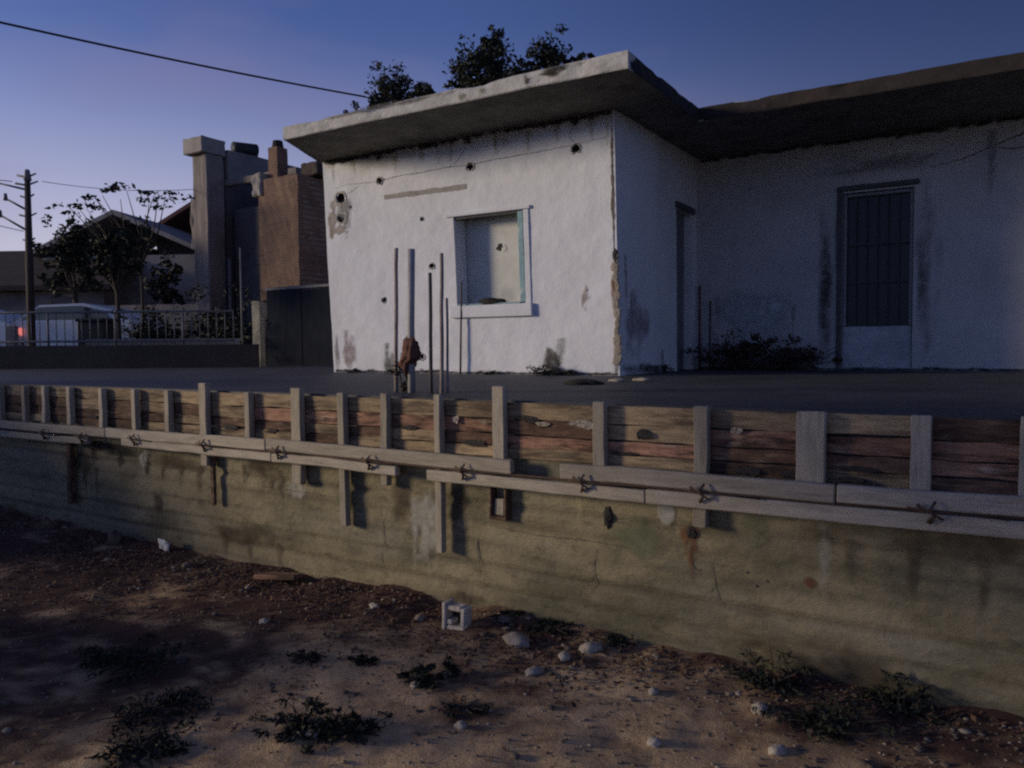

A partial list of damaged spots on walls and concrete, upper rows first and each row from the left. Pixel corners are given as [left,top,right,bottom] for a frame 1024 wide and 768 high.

spalling [328,190,352,238]
spalling [611,248,649,366]
damp [820,249,831,328]
damp [336,333,616,375]